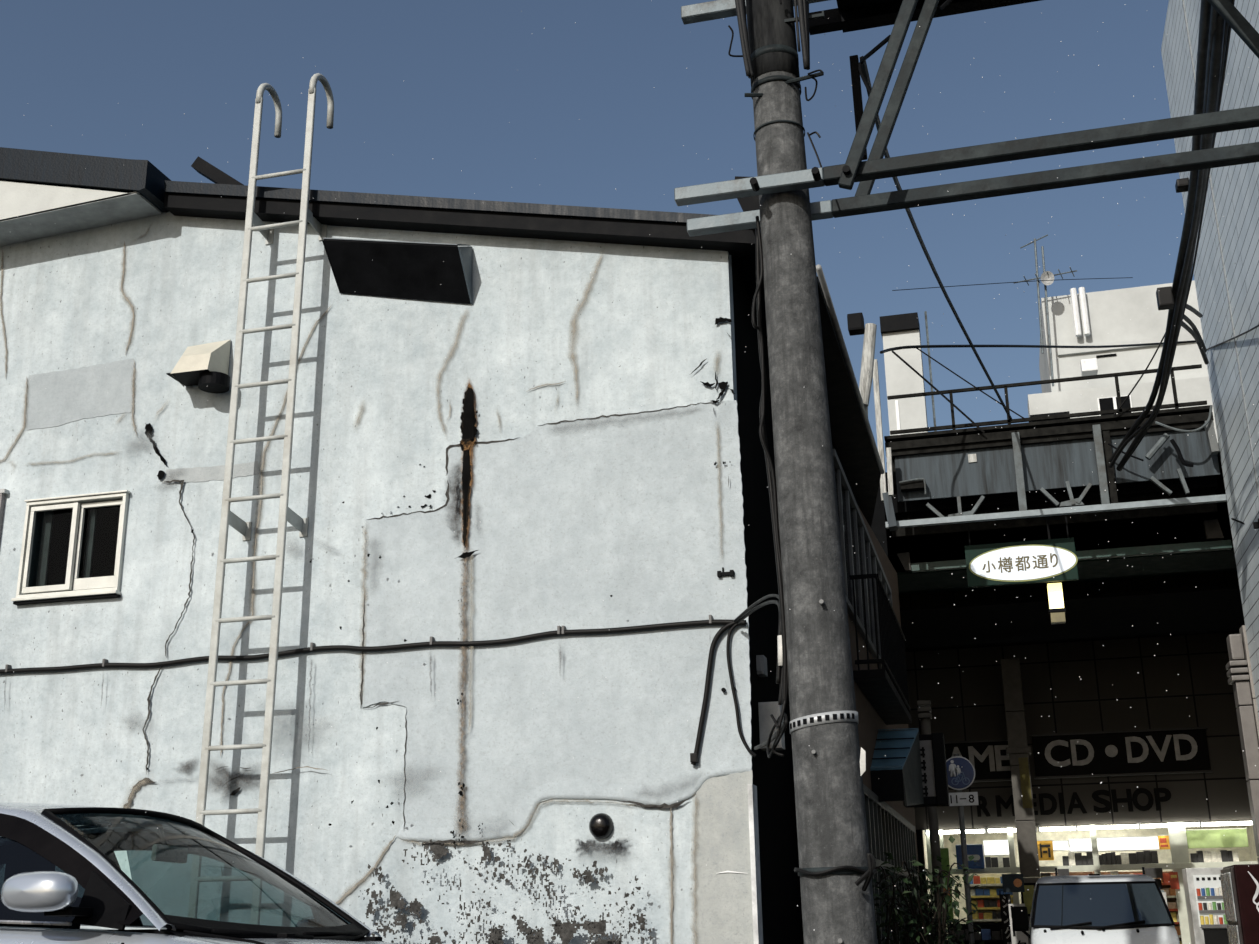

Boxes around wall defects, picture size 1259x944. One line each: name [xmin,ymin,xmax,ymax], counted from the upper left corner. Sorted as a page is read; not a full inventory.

crack [0,229,195,808]
rust [450,382,483,844]
peeling [358,839,654,944]